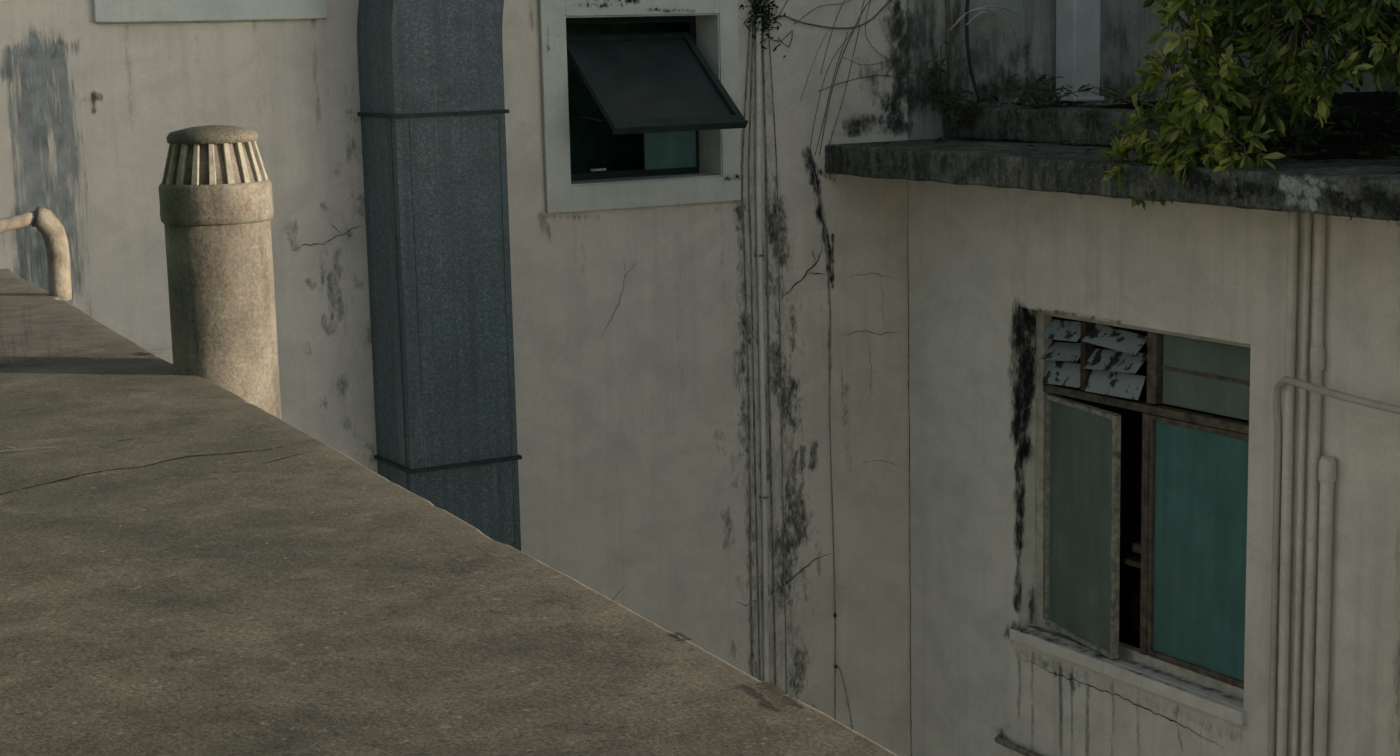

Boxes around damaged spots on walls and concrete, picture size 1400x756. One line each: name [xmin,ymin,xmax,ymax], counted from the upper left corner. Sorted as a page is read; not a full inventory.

water stain [848,0,1067,136]
water stain [1,29,82,295]
crack [0,439,318,495]
water stain [775,444,817,603]